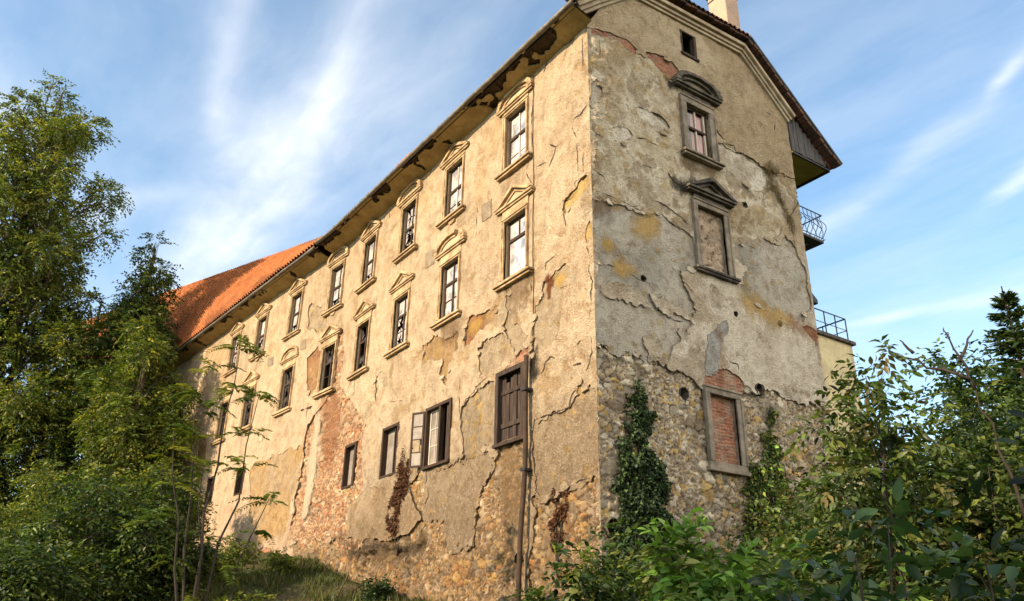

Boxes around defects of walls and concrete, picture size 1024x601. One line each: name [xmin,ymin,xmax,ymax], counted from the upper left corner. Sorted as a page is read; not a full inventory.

flaking render [249,331,379,556]
crack [526,99,690,420]
flaking render [564,27,818,365]
flaking render [704,369,746,394]